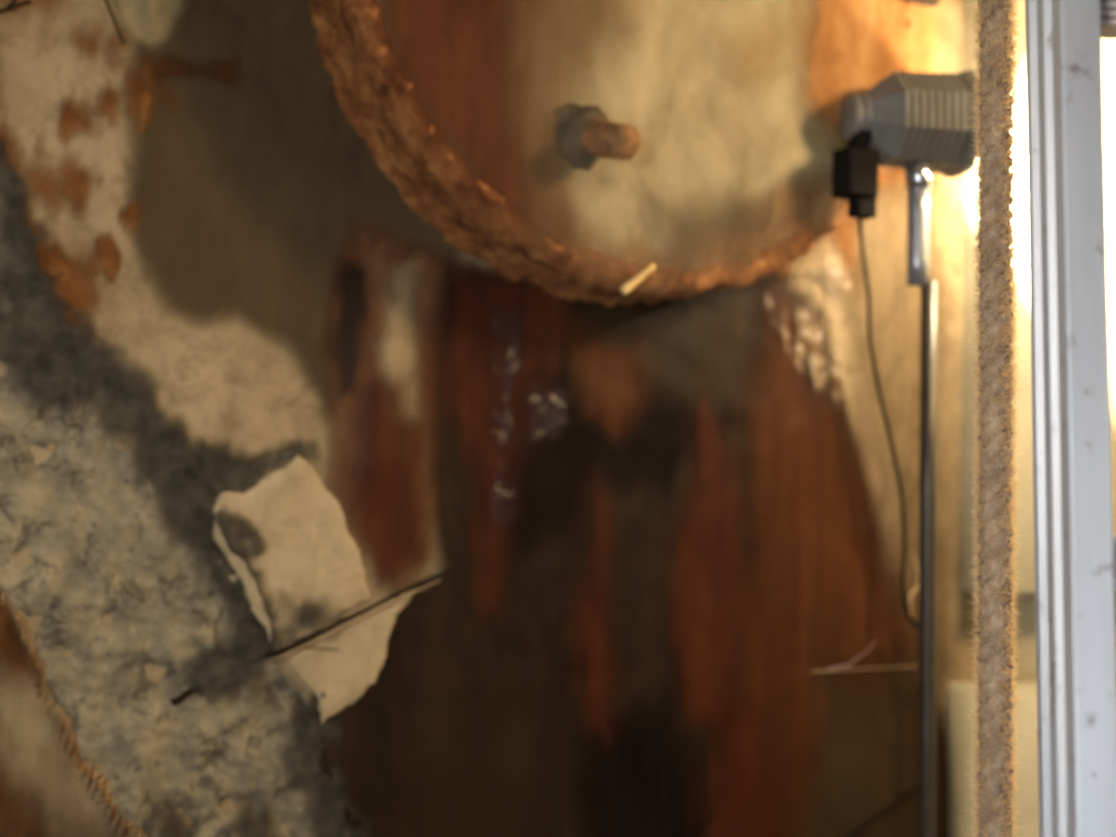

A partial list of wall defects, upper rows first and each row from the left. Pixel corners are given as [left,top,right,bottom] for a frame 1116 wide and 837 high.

rust [25,163,88,212]
rust [60,87,118,142]
rust [119,203,140,229]
rust [308,0,860,307]
rust [876,166,906,199]
rust [30,228,120,322]
rust [330,228,439,584]
damp [132,0,919,837]
spalling [0,146,418,837]
crack [264,570,447,663]
crack [170,688,194,705]
damp [935,694,949,837]